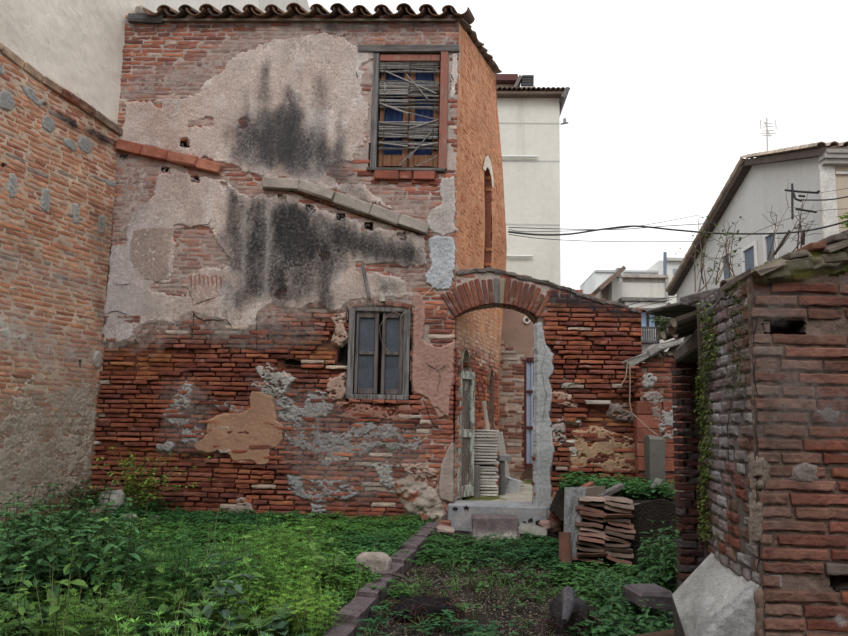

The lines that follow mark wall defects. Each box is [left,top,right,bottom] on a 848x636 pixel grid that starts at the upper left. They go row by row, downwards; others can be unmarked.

leakage [231,90,342,180]
peeling [450,53,461,99]
peeling [102,28,459,376]
leakage [227,192,420,310]
peeling [0,377,214,523]